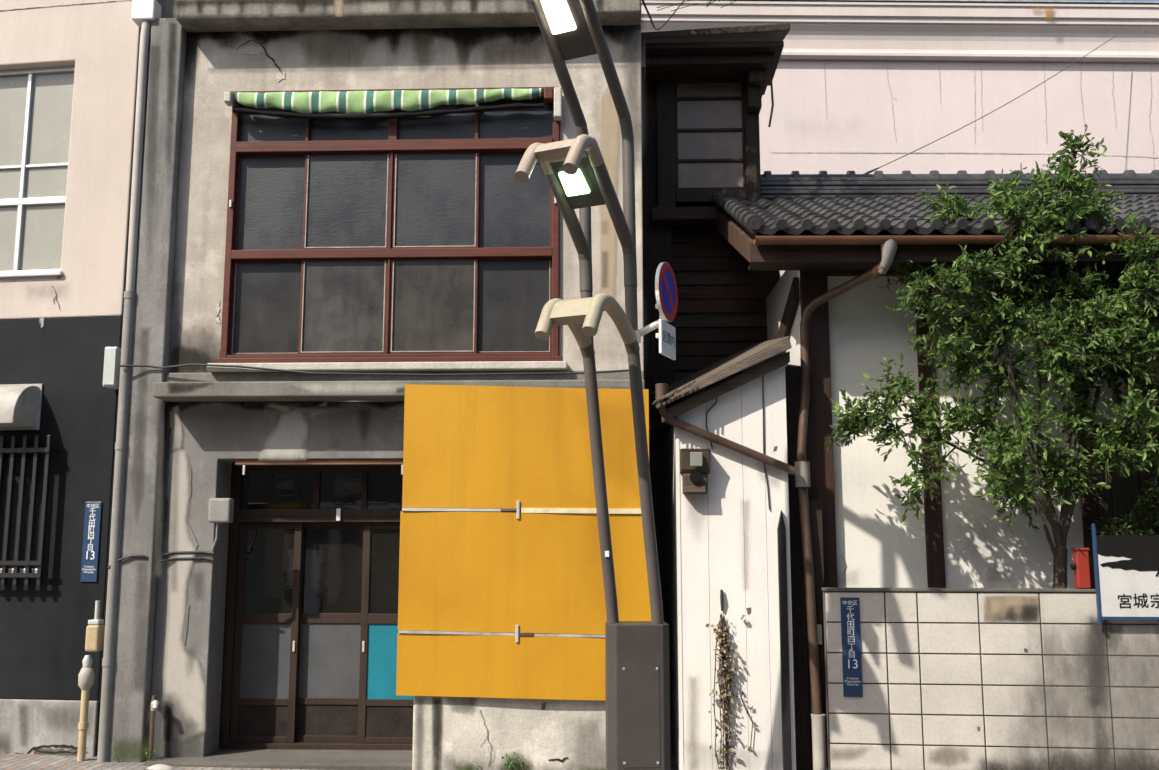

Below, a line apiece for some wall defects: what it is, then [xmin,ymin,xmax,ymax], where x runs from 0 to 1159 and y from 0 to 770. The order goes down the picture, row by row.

crack [236,40,283,74]
damp [148,0,541,193]
damp [597,0,640,102]
crack [886,61,897,142]
crack [974,61,983,145]
crack [1041,63,1049,140]
crack [1107,63,1159,170]
damp [134,416,143,490]
peeling [164,406,205,737]
damp [986,597,1038,620]
damp [1089,619,1115,705]